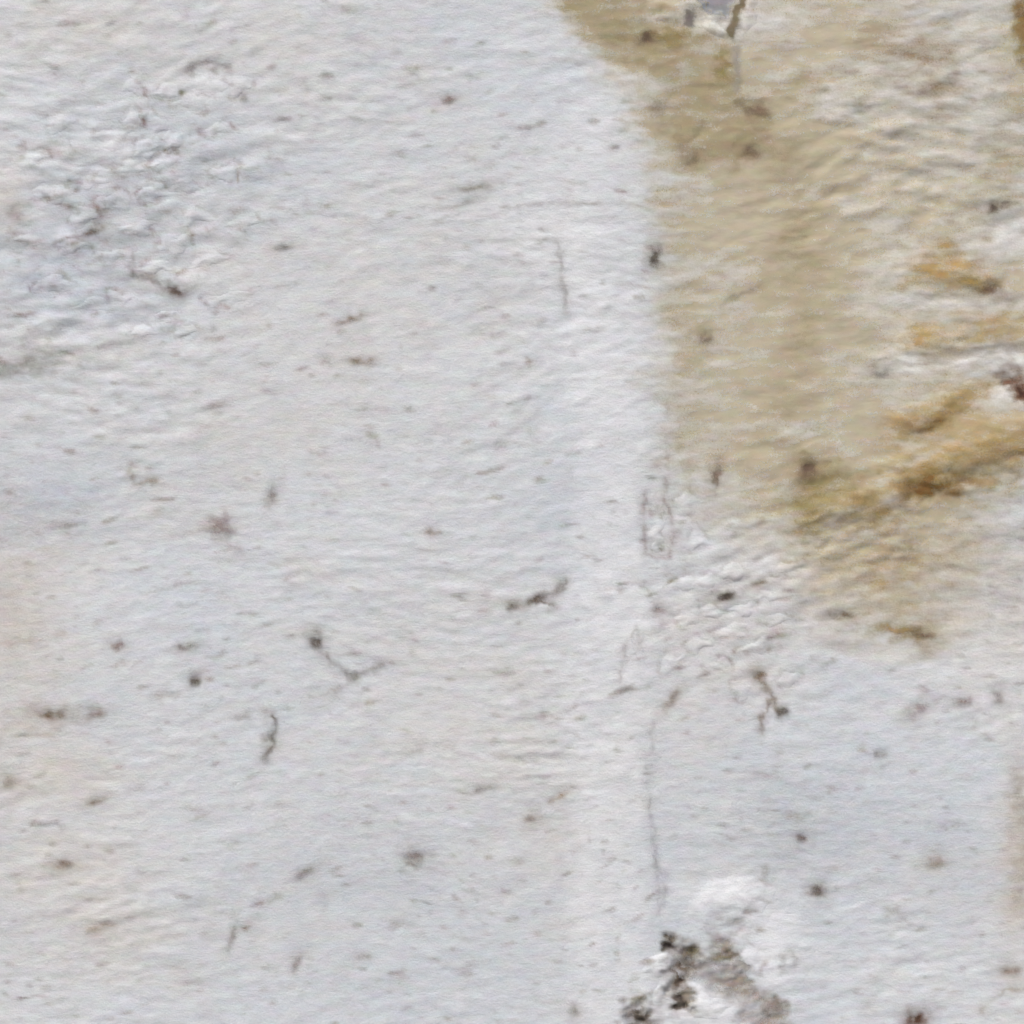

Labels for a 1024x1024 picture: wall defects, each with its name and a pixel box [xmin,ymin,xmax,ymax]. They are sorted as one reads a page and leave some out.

leakage [1012,3,1024,63]
leakage [918,243,977,284]
leakage [919,389,979,431]
leakage [794,463,867,533]
spalling [626,934,784,1024]